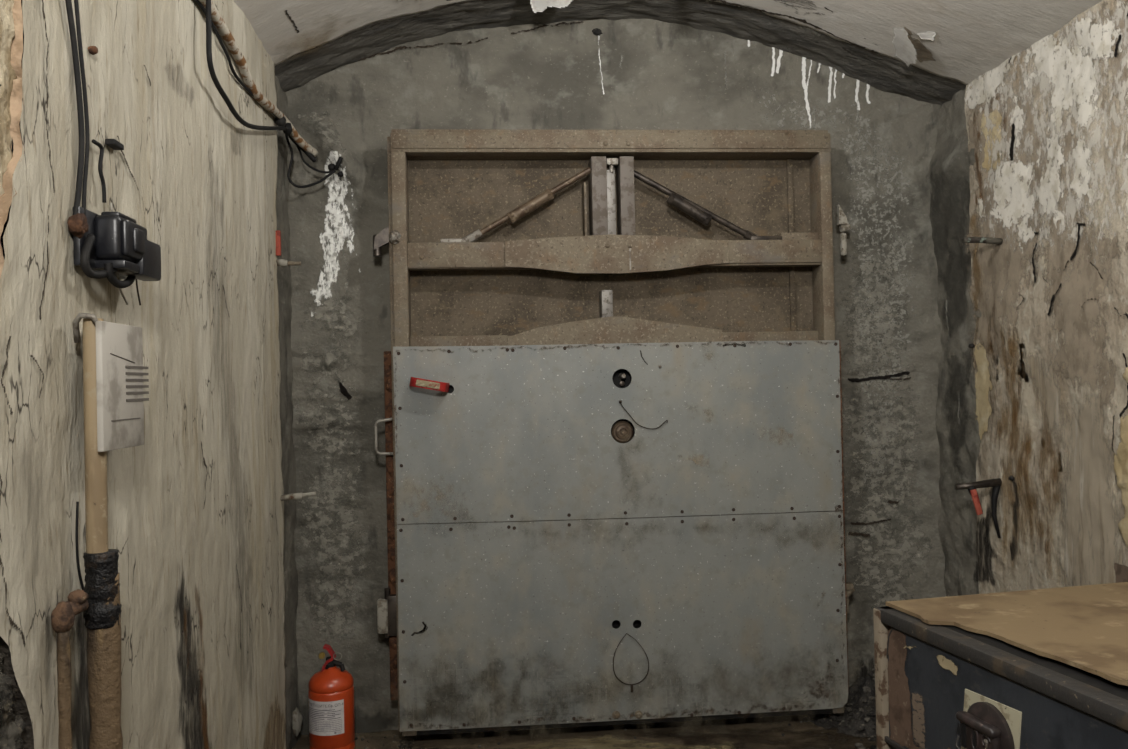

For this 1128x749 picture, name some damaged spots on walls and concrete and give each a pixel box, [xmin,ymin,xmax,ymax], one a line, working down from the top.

peeling [530,0,572,13]
peeling [892,27,936,66]
leakage [1092,0,1128,111]
peeling [964,0,1128,263]
efflorescence [311,151,361,317]
leakage [753,47,931,608]
peeling [974,343,993,443]
leakage [930,82,1128,587]
spalling [1113,408,1128,547]
leakage [298,461,371,647]
peeling [1114,563,1128,583]